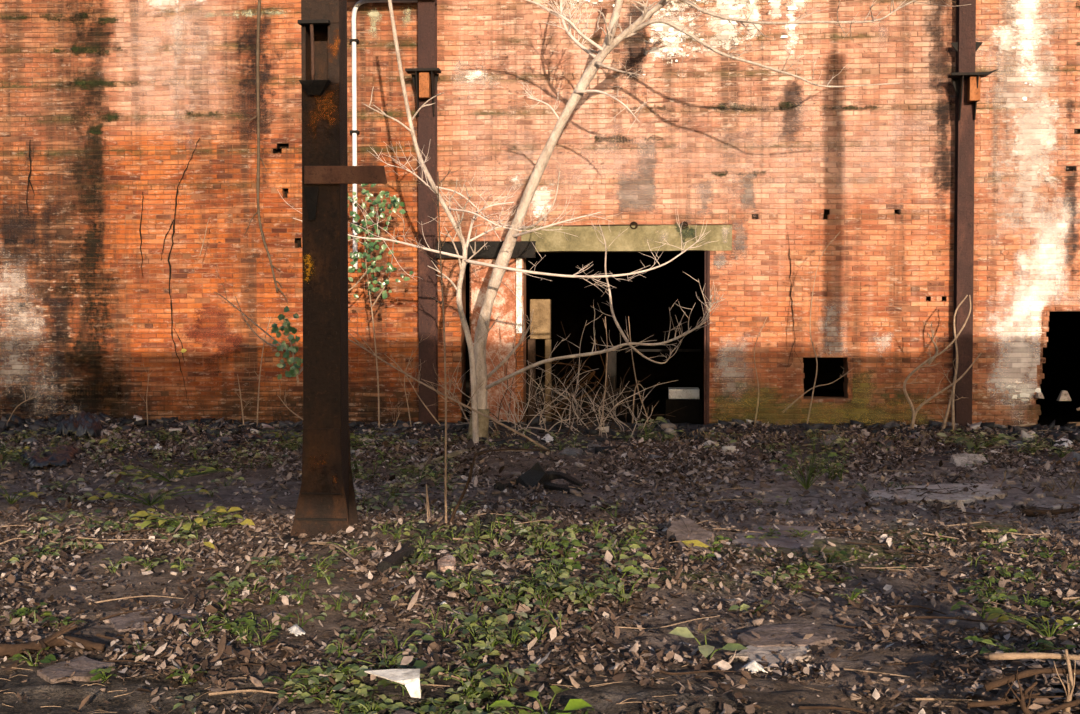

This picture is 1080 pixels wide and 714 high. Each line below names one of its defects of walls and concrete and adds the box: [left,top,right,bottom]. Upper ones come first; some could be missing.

damp [0,0,124,420]
crack [139,138,200,408]
rust [307,90,338,138]
peeling [645,0,804,79]
damp [992,0,1079,395]